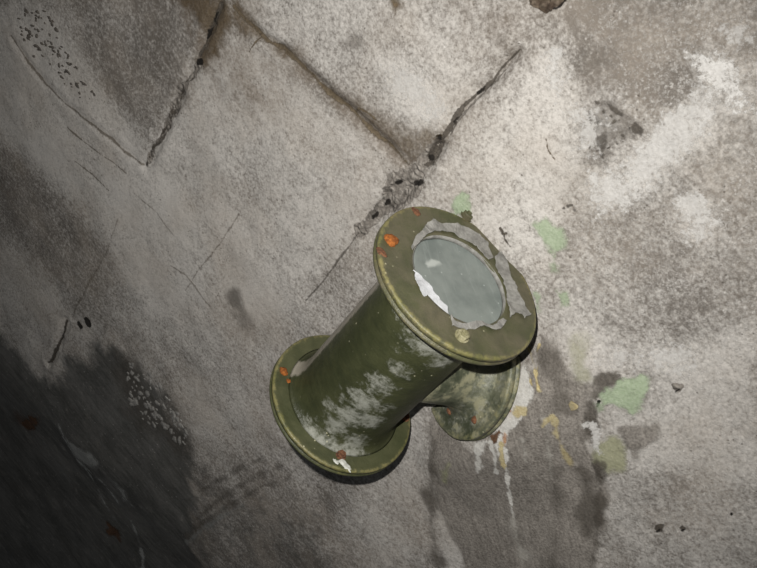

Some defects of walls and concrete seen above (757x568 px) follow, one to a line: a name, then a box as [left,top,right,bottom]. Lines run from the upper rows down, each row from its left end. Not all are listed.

spalling [529,0,566,14]
peeling [17,9,96,98]
crack [146,2,520,219]
crack [48,317,91,363]
peeling [600,374,649,414]
water stain [423,339,697,568]
peeling [594,437,625,472]